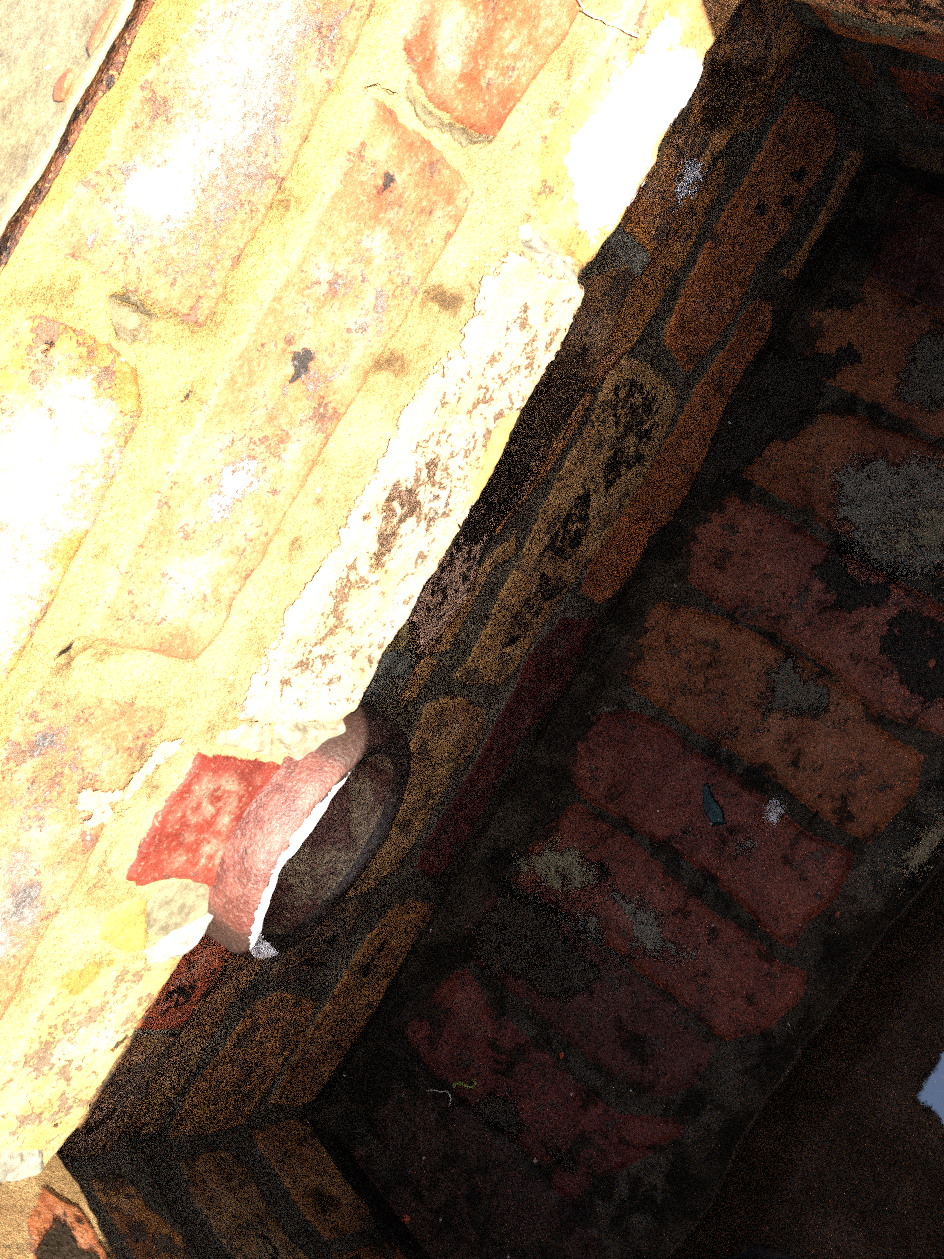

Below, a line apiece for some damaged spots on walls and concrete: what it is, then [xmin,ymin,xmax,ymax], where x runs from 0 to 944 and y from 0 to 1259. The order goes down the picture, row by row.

leakage [85,0,350,290]
leakage [0,381,108,660]
leakage [23,725,111,782]